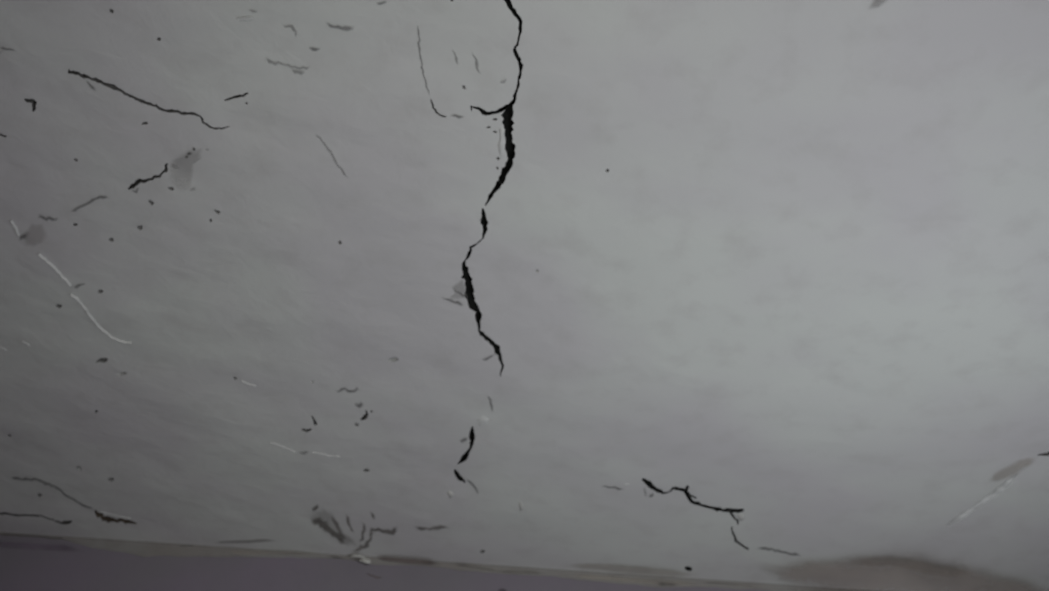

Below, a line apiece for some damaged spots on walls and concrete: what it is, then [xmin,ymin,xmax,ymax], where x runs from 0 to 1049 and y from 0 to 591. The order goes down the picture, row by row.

crack [68,69,229,130]
crack [224,93,248,104]
crack [20,163,174,238]
crack [418,0,523,491]
crack [0,477,137,525]
crack [605,478,797,555]
damp [788,563,1030,591]